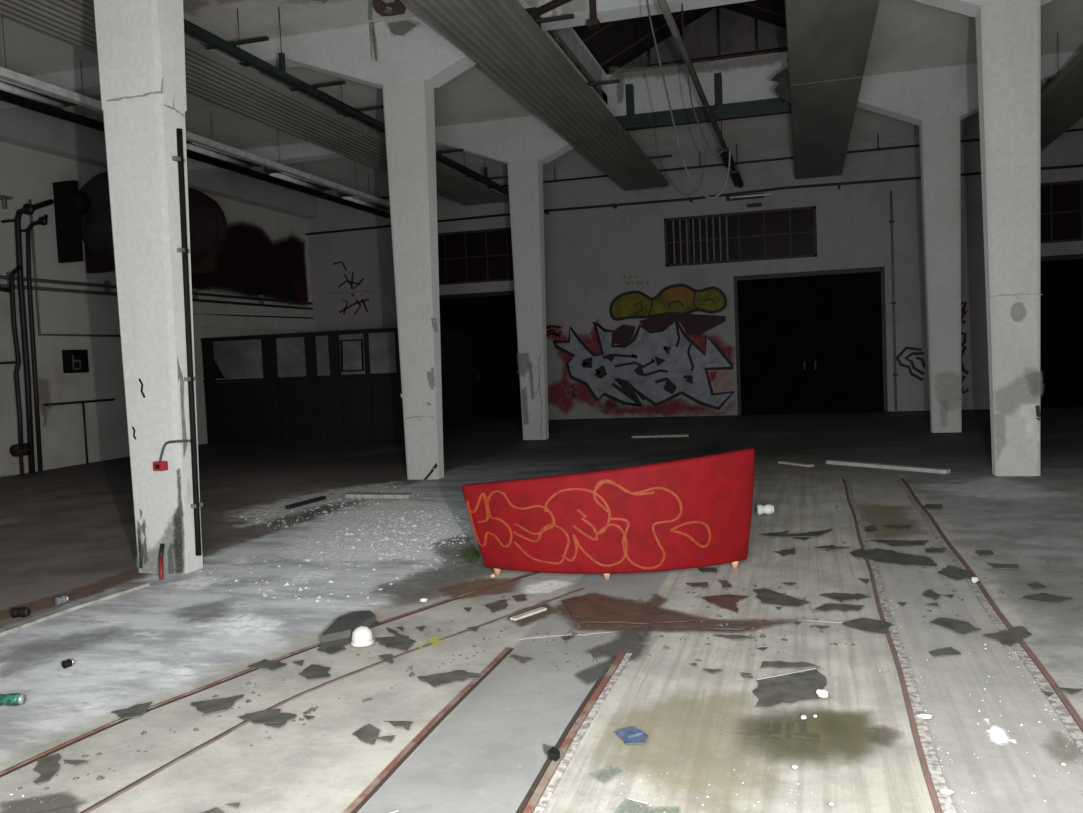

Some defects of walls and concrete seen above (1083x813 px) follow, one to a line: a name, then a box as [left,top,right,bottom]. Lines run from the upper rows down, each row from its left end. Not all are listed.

crack [106,79,186,118]
damp [508,593,789,683]
damp [628,703,895,788]